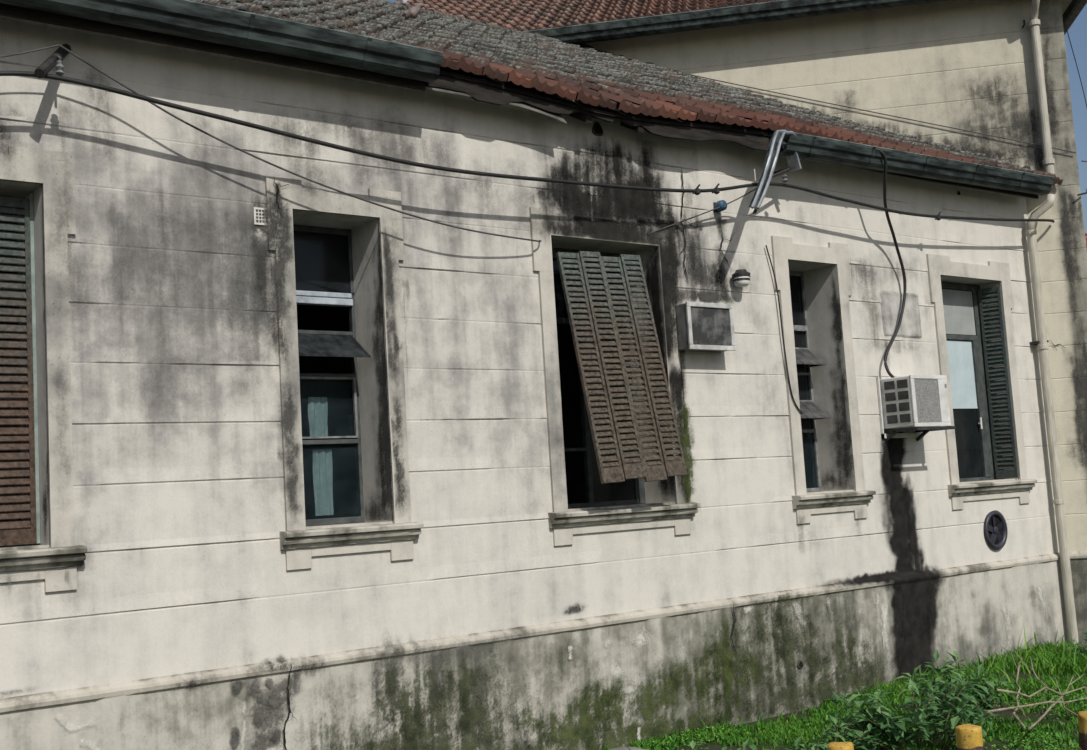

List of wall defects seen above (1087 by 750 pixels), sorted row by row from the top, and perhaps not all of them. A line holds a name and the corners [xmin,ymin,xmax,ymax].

water stain [1061,191,1083,318]
water stain [1071,342,1087,464]
water stain [839,429,943,681]
crack [283,665,295,750]
water stain [261,656,323,692]
water stain [393,643,481,663]